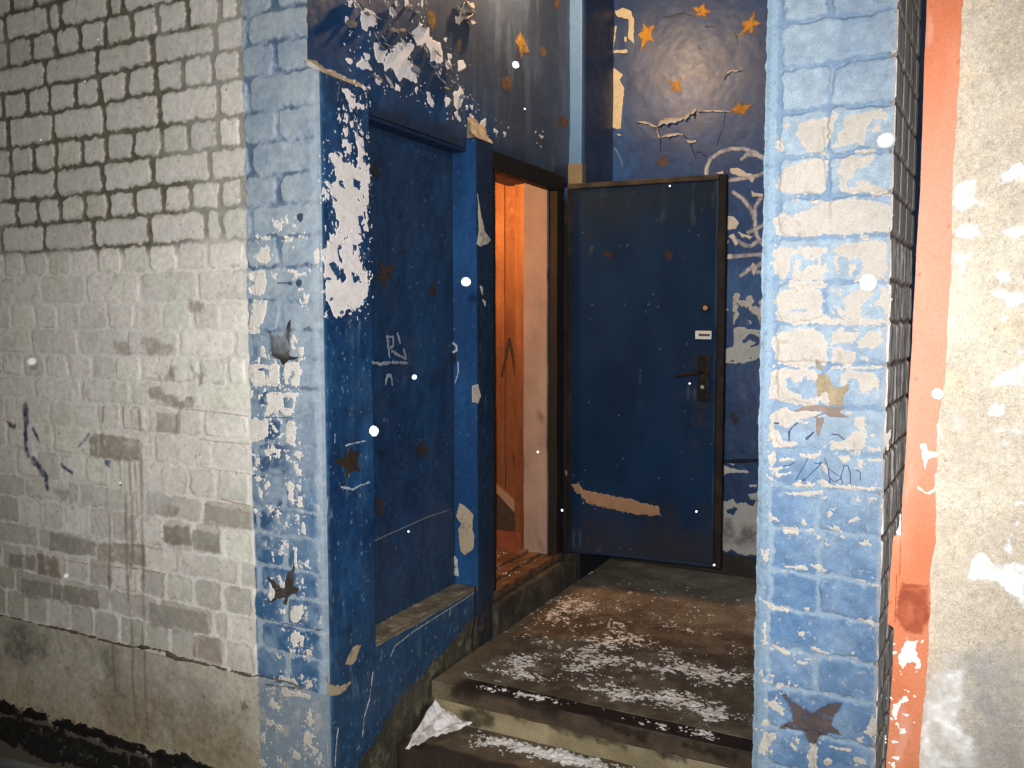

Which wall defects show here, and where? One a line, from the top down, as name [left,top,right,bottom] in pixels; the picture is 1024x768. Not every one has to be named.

peeling [613,8,634,54]
peeling [613,68,624,136]
crack [637,108,731,158]
peeling [717,108,894,562]
peeling [163,0,509,768]
peeling [917,424,941,494]
peeling [782,564,827,572]
crack [0,614,303,689]
peeling [893,638,924,680]